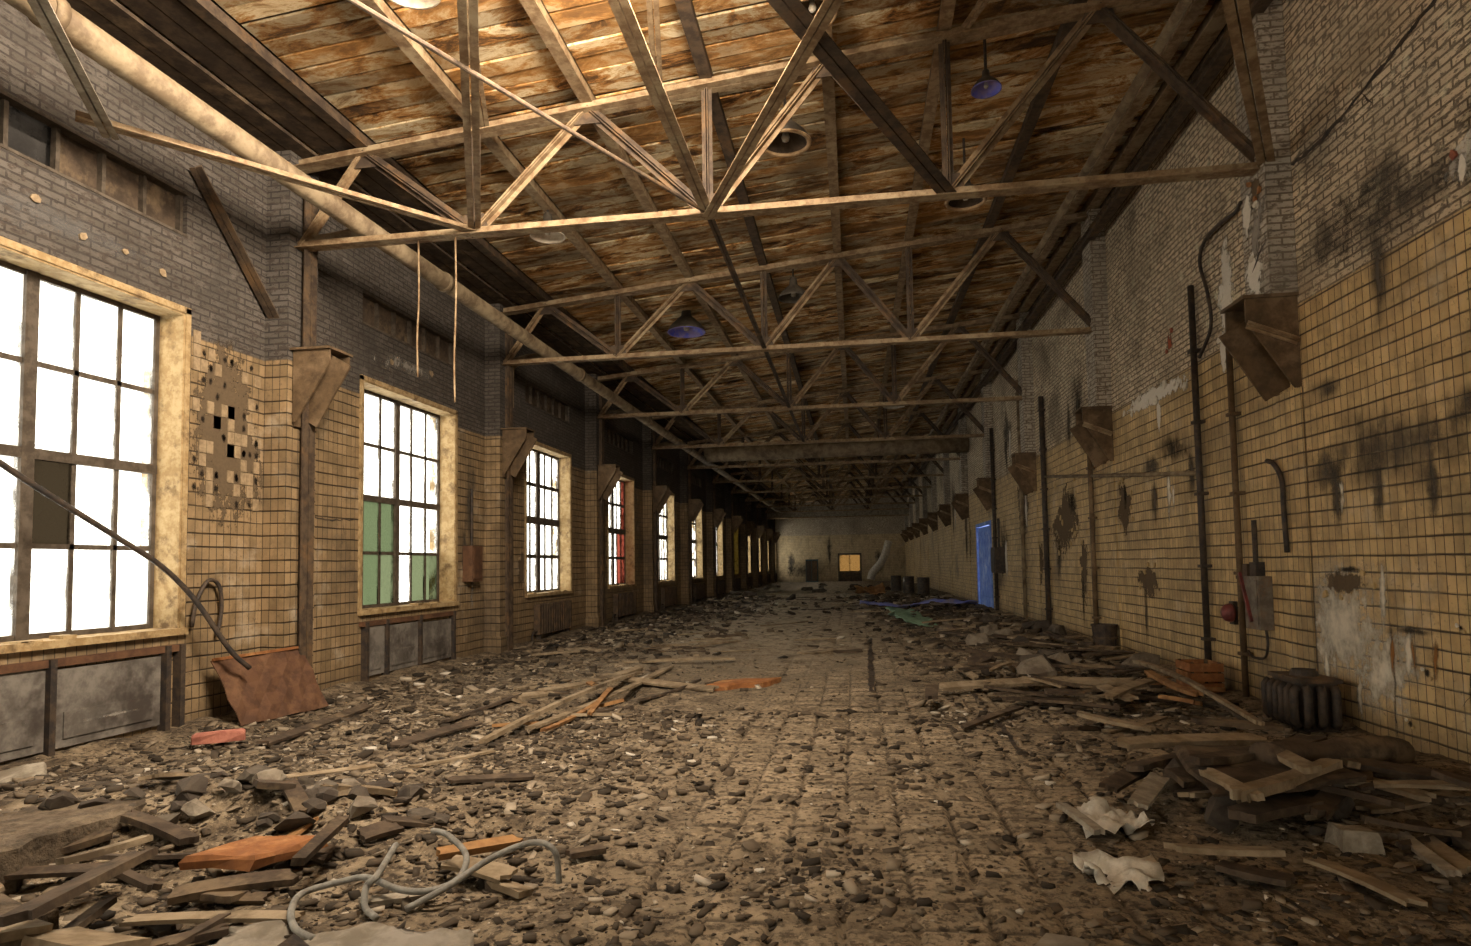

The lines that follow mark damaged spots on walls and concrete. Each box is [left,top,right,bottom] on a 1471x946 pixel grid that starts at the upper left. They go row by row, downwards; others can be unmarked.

peeling [1444,129,1471,182]
damp [1371,239,1385,304]
spalling [189,329,263,528]
damp [1332,472,1344,522]
damp [1428,460,1438,510]
spalling [1322,567,1377,600]